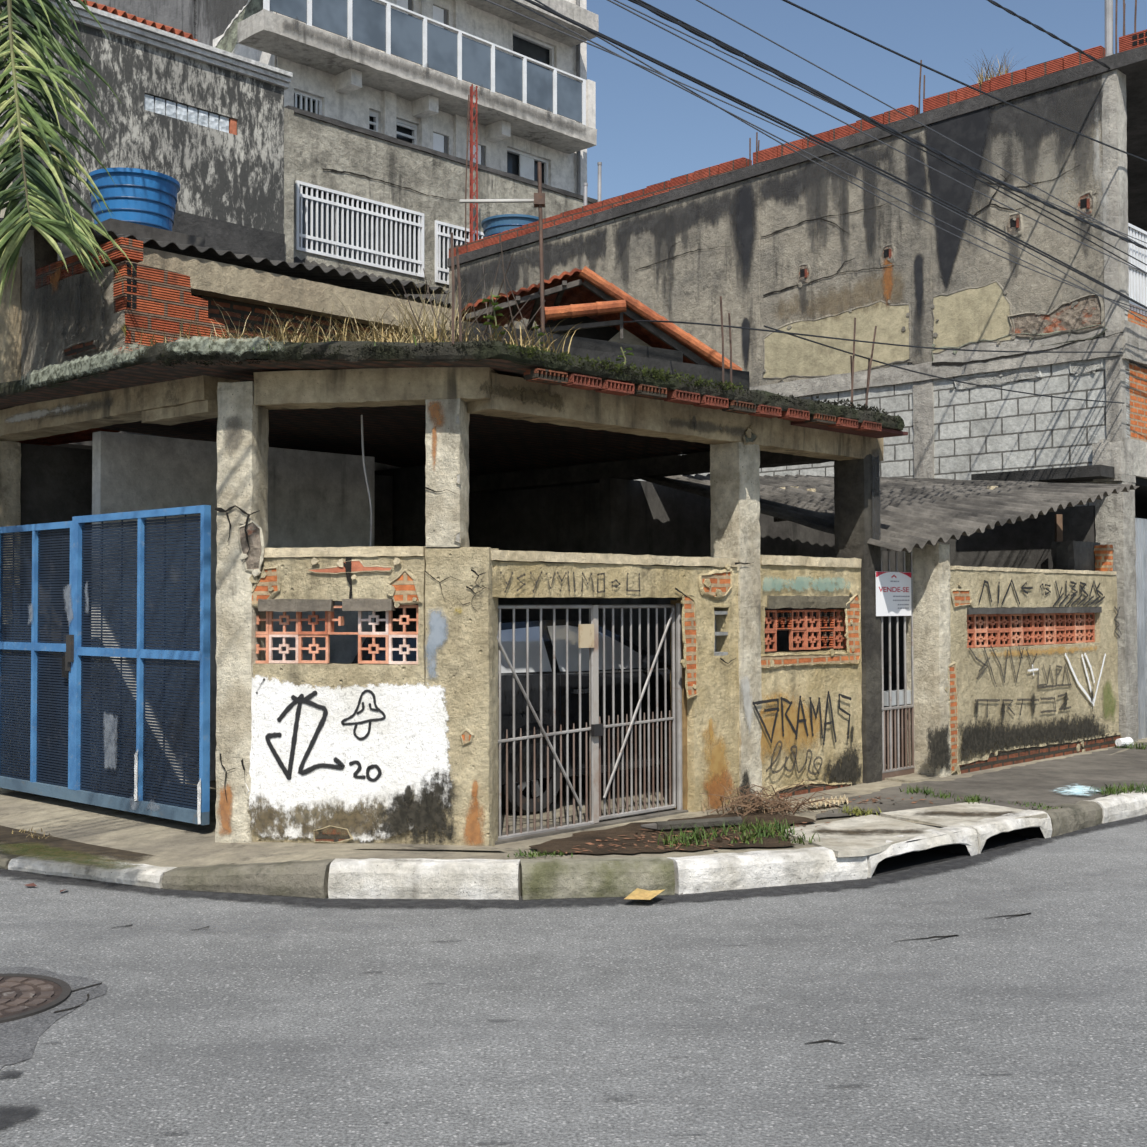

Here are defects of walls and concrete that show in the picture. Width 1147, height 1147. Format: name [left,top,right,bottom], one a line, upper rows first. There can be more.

damp [454,76,1107,311]
crack [762,201,906,297]
damp [914,254,924,351]
flaking render [930,280,1107,361]
rust [428,402,443,464]
crack [214,505,260,563]
spalling [238,520,281,608]
crack [424,569,486,608]
flaking render [680,564,732,700]
damp [927,691,1117,771]
damp [248,771,456,843]
rust [464,781,483,845]